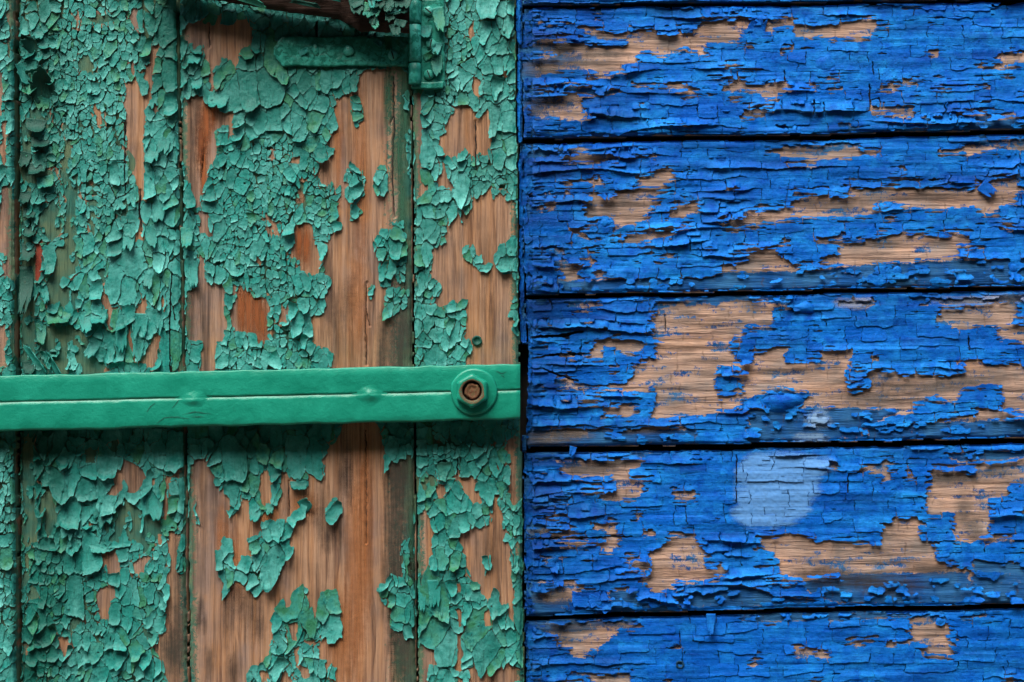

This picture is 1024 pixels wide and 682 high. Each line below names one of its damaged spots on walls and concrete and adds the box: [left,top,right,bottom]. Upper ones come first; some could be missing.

peeling [0,0,519,376]
corrosion [459,379,484,406]
peeling [19,135,1024,682]
crack [365,0,869,682]
peeling [521,3,1024,138]
crack [555,2,1024,268]
crack [607,205,1024,583]
crack [766,517,1024,682]